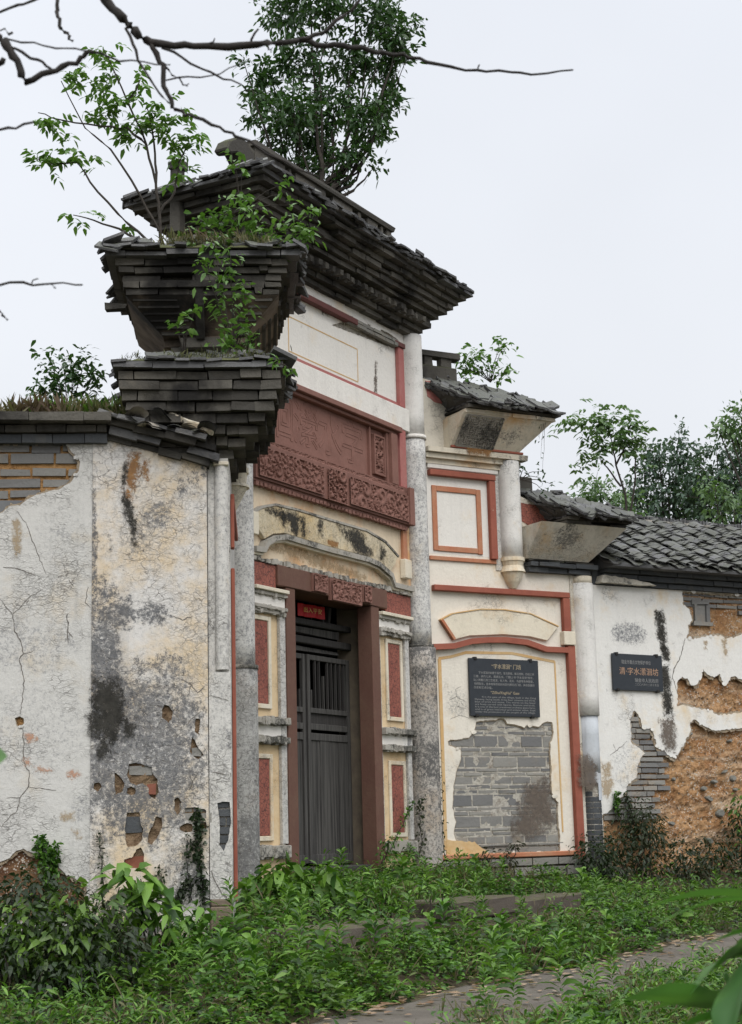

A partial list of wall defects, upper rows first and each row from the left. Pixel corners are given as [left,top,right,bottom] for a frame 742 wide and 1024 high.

flaking render [0,444,79,512]
water stain [121,462,139,547]
water stain [265,507,323,538]
water stain [336,523,386,561]
crack [0,511,90,826]
water stain [87,660,152,760]
water stain [654,610,677,753]
flaking render [677,675,742,713]
flaking render [124,812,162,868]
flaking render [174,797,231,851]
flaking render [449,720,563,853]
flaking render [584,714,742,878]